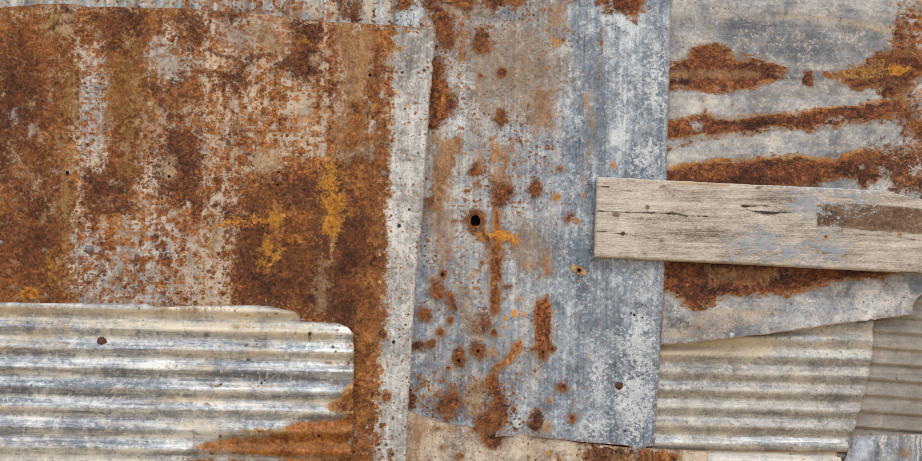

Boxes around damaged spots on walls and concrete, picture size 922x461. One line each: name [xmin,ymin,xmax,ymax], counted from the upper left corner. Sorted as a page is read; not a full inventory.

corrosion [594,0,653,25]
corrosion [667,15,922,199]
corrosion [0,0,409,339]
corrosion [395,0,569,450]
corrosion [663,261,898,329]
corrosion [325,379,354,414]
corrosion [204,427,352,461]
corrosion [577,443,687,461]